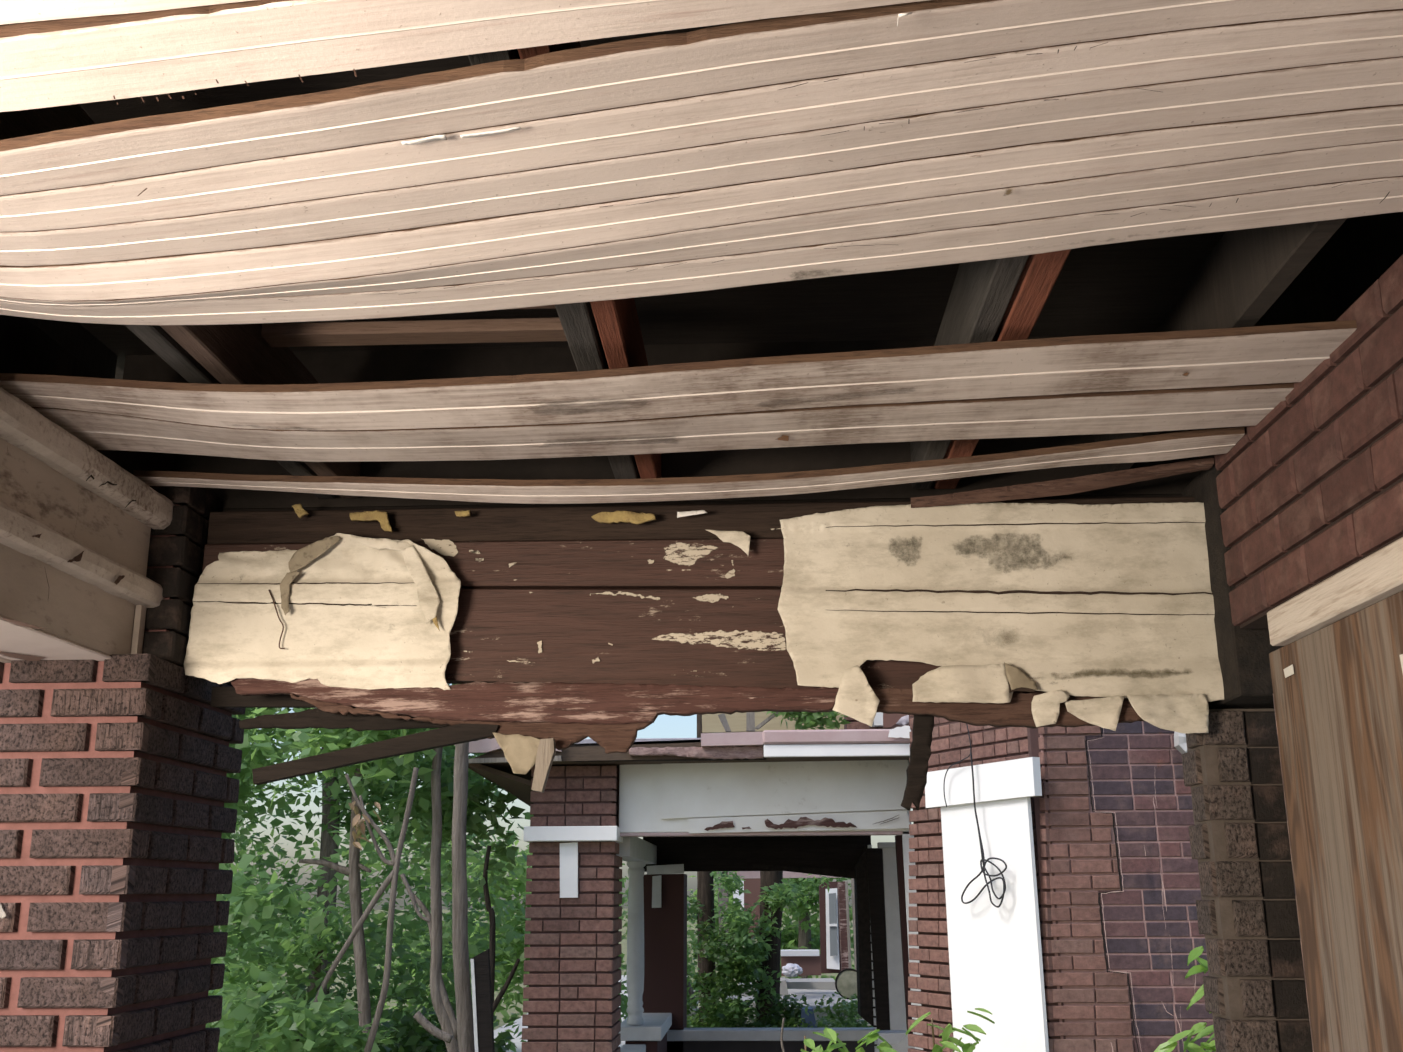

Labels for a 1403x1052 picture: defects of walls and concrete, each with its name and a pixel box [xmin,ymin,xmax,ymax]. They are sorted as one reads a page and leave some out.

water stain [958,536,1066,567]
peeling [647,530,751,603]
peeling [590,591,660,600]
peeling [653,630,786,651]
peeling [888,725,911,738]
peeling [704,817,858,831]